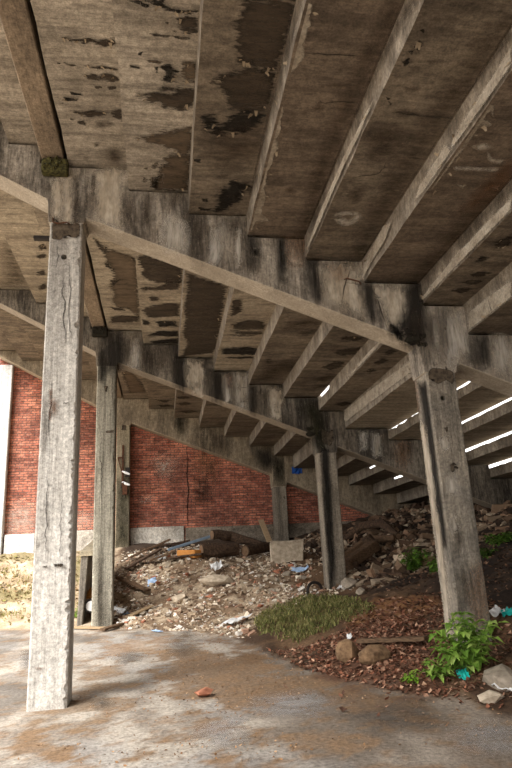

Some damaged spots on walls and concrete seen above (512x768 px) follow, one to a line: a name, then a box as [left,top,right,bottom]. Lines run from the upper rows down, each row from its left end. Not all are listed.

peeling [57,62,119,90]
peeling [62,37,115,49]
peeling [62,92,122,125]
peeling [136,51,196,111]
peeling [198,0,319,231]
peeling [136,127,201,191]
crack [57,253,71,337]
peeling [93,238,265,396]
damp [389,185,510,350]
crack [183,454,191,520]